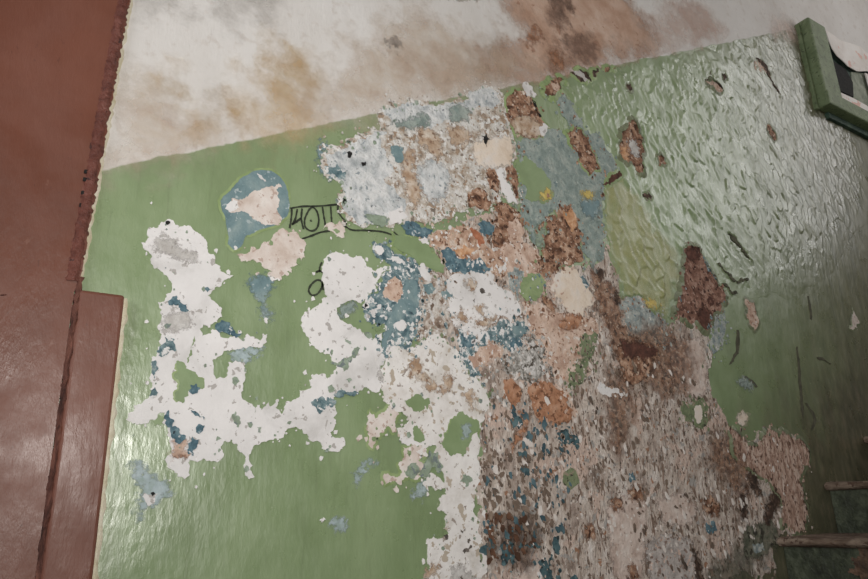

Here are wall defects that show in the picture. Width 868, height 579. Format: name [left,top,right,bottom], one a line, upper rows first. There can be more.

leakage [334,0,664,109]
spalling [125,63,813,579]
peeling [849,308,861,332]